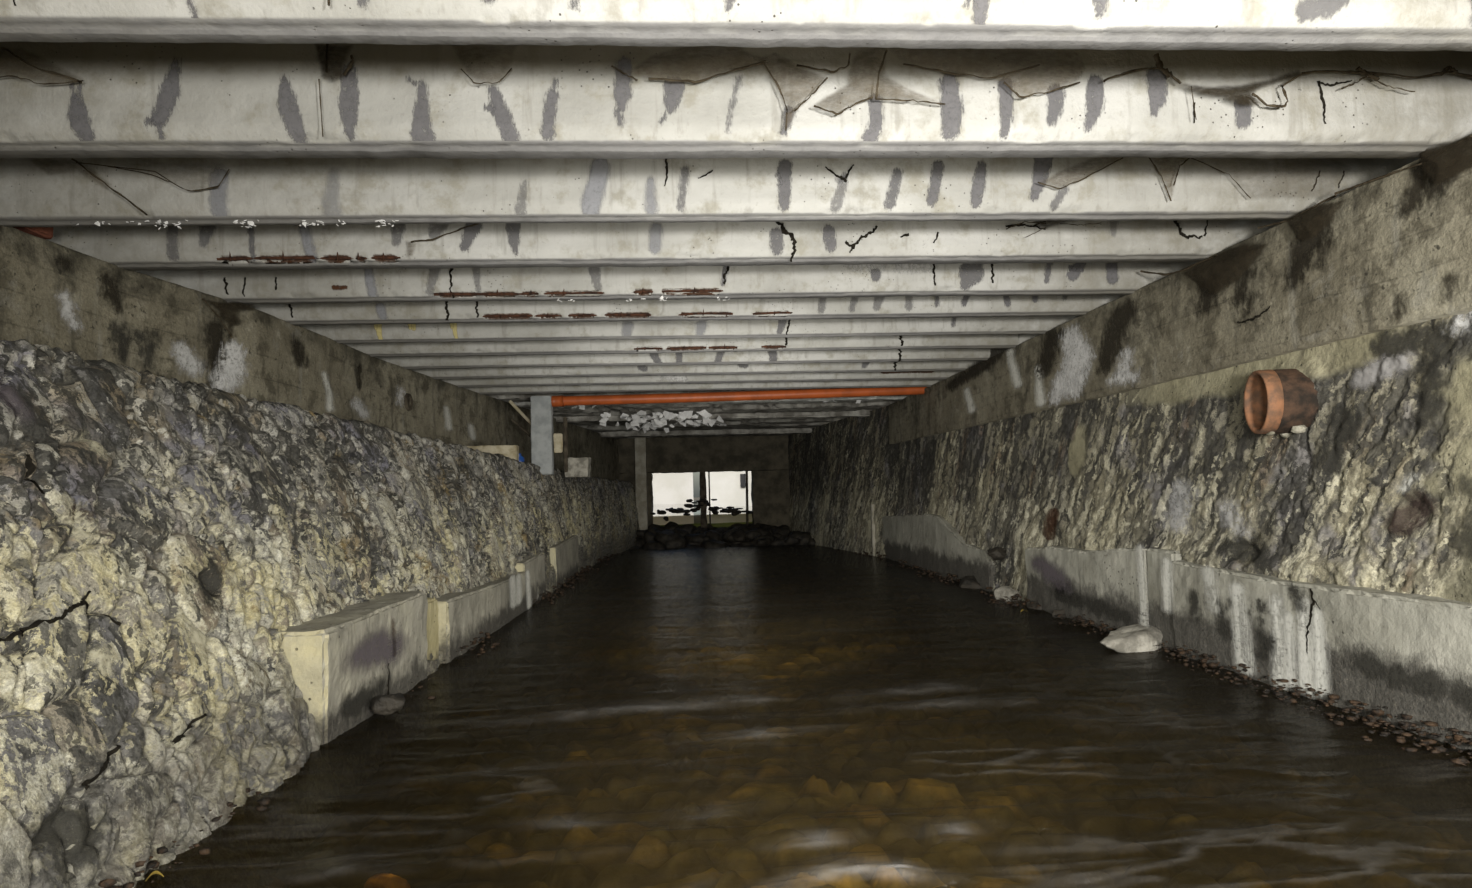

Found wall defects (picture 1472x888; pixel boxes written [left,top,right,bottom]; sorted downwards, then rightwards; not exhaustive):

water stain [67,83,95,141]
water stain [144,58,182,140]
water stain [277,76,307,143]
water stain [338,65,359,141]
water stain [408,77,436,141]
water stain [484,86,520,141]
water stain [540,79,559,141]
crack [1317,80,1352,124]
crack [776,222,797,262]
crack [845,225,939,286]
crack [0,590,122,642]
crack [1305,588,1320,654]